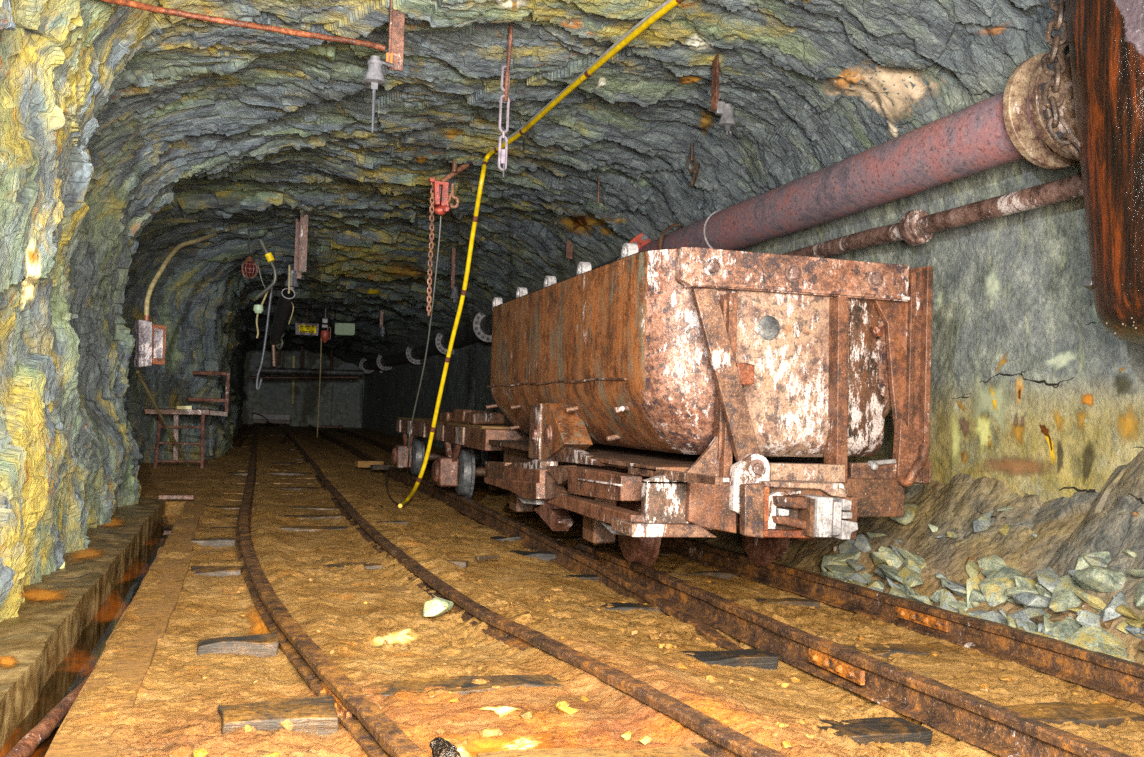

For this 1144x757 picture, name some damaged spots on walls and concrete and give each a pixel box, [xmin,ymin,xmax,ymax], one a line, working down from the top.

rust [957,388,997,448]
crack [952,371,1074,399]
rust [1013,378,1024,442]
rust [988,414,1062,474]
rust [1078,394,1093,426]
rust [1119,412,1135,438]